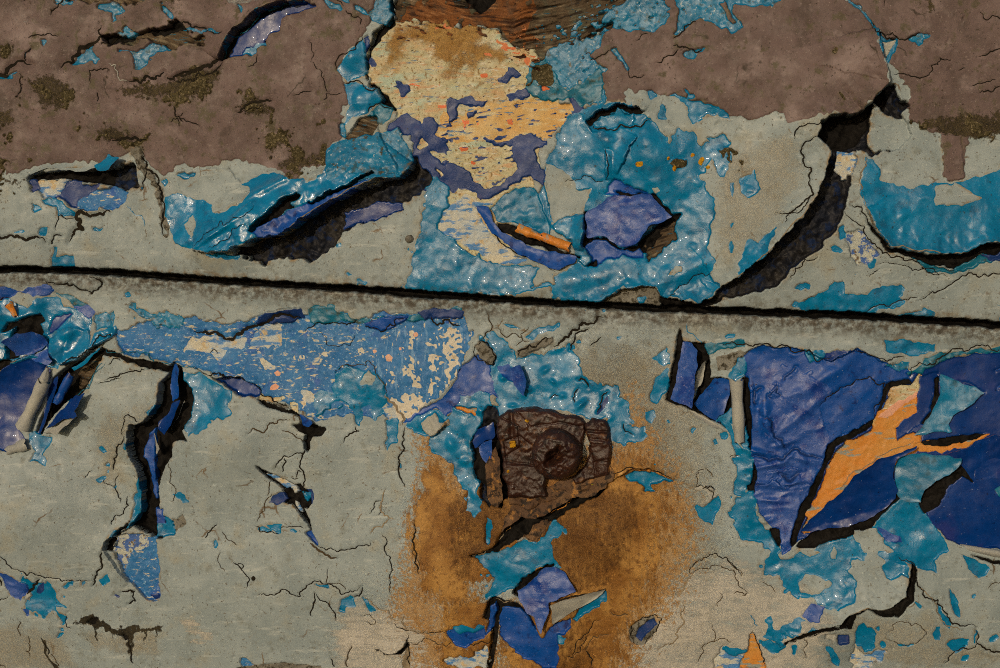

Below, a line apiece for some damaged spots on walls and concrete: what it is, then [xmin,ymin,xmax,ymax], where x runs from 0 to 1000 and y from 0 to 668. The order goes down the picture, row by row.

peeling [325,0,1000,313]
peeling [897,307,935,317]
crack [17,621,59,667]
peeling [0,558,87,638]
crack [205,525,250,587]
peeling [0,277,656,604]
crack [369,428,420,594]
peeling [261,520,607,668]
corrosion [381,381,712,668]
peeling [650,326,1000,668]